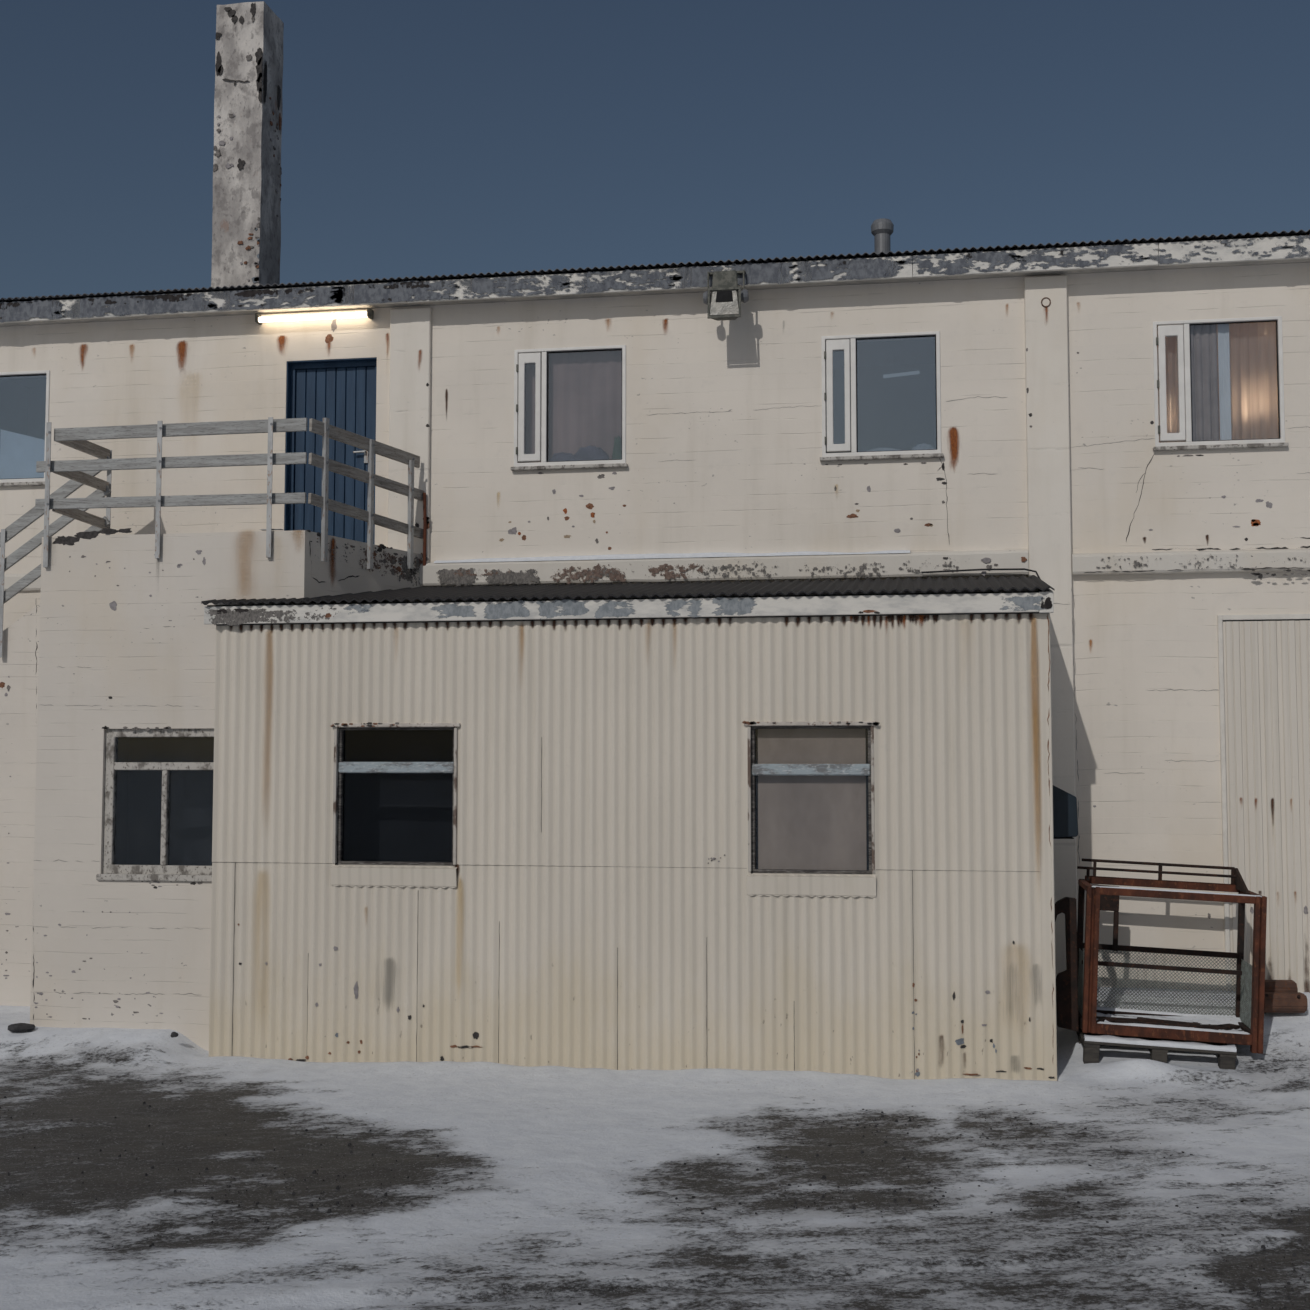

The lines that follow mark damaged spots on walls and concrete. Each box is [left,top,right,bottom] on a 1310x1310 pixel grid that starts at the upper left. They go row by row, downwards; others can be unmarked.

spalling [213,114,245,172]
peeling [0,217,1310,332]
rust [178,341,186,368]
rust [949,427,958,465]
peeling [799,557,959,580]
peeling [206,604,373,626]
peeling [1000,595,1052,611]